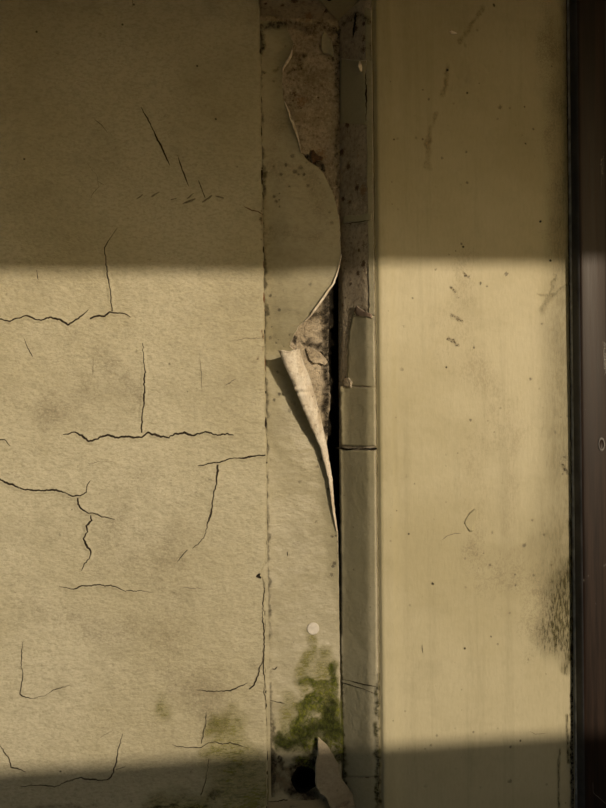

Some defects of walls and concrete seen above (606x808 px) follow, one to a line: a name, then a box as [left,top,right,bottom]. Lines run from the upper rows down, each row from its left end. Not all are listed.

crack [141,107,205,197]
crack [0,227,132,357]
crack [0,343,266,595]
peeling [256,8,379,808]
crack [20,642,69,699]
crack [203,577,285,704]
water stain [542,556,574,808]
crack [0,733,126,790]
crack [174,712,247,795]
water stain [270,723,318,800]